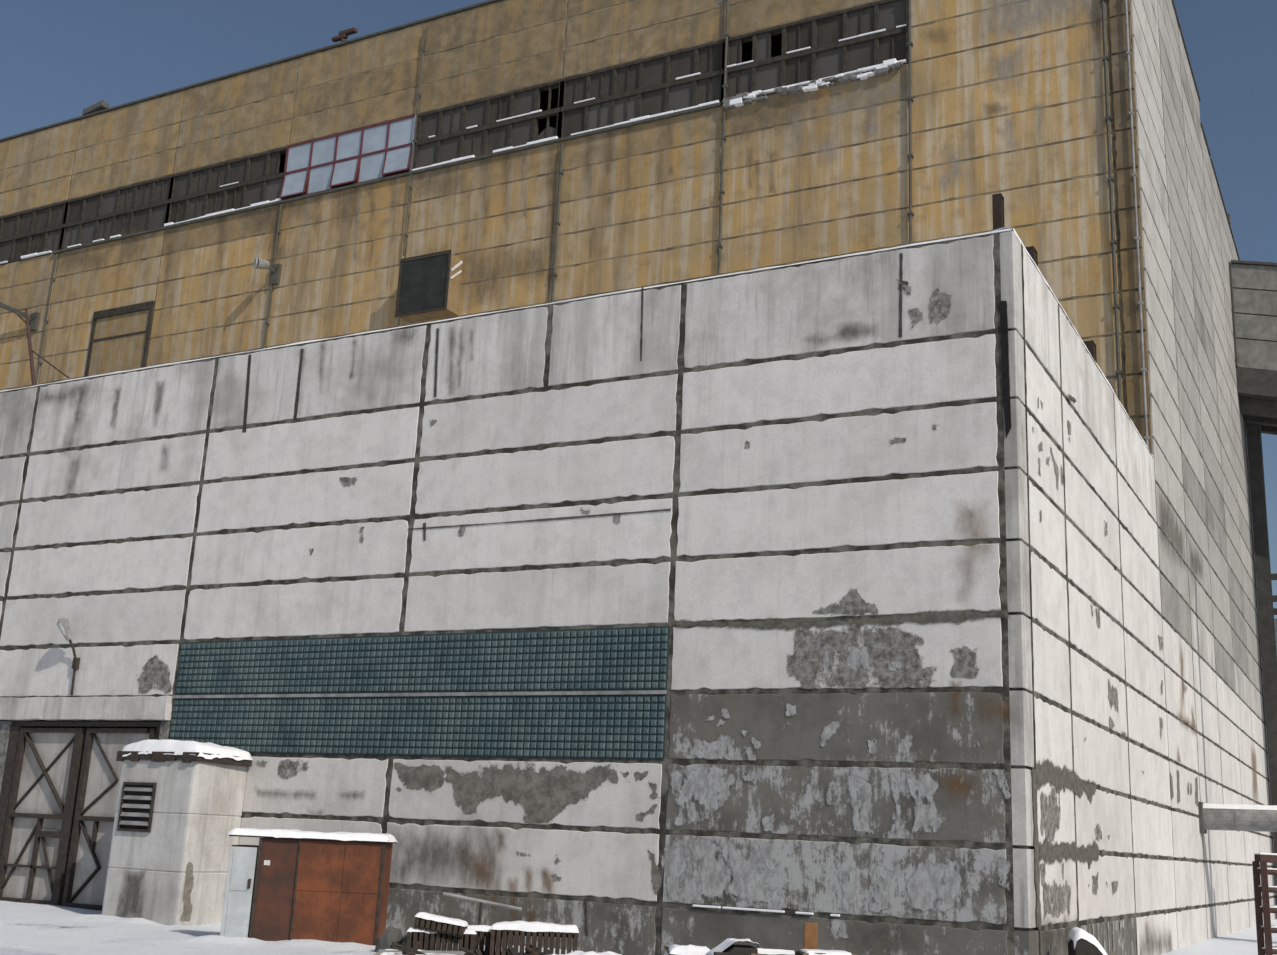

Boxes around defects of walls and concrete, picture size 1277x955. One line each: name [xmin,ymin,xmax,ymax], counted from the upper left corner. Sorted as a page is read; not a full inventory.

peeling [897,279,951,328]
peeling [1033,428,1063,490]
peeling [787,589,980,696]
peeling [137,655,172,693]
peeling [786,703,797,716]
peeling [1108,680,1127,737]
spalling [394,762,661,824]
peeling [890,773,943,833]
peeling [1040,788,1060,842]
peeling [648,842,704,904]
peeling [998,858,1010,890]
peeling [1041,863,1071,920]